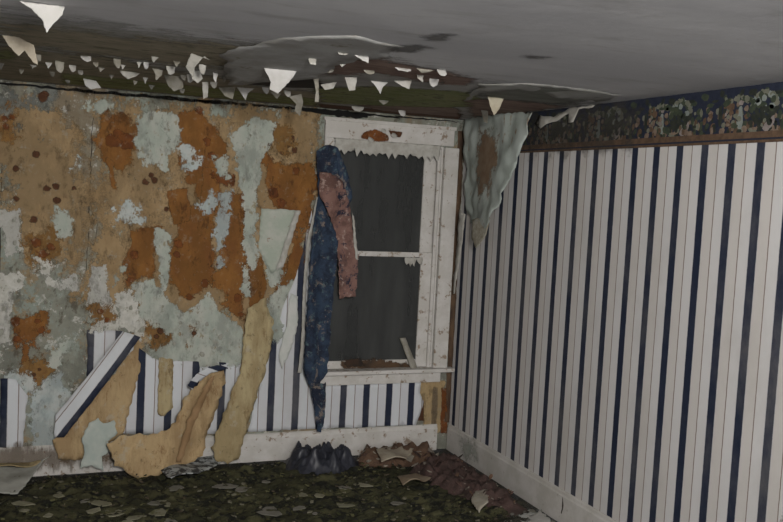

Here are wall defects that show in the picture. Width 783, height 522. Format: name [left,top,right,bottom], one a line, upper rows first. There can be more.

peeling [19,1,65,33]
peeling [2,35,303,116]
peeling [313,52,447,105]
peeling [481,97,503,123]
peeling [535,105,595,128]
leakage [0,6,590,337]
peeling [0,208,22,258]
peeling [49,205,75,240]
peeling [131,110,300,344]
peeling [0,227,243,446]
leakage [432,387,448,434]
peeling [80,418,118,471]